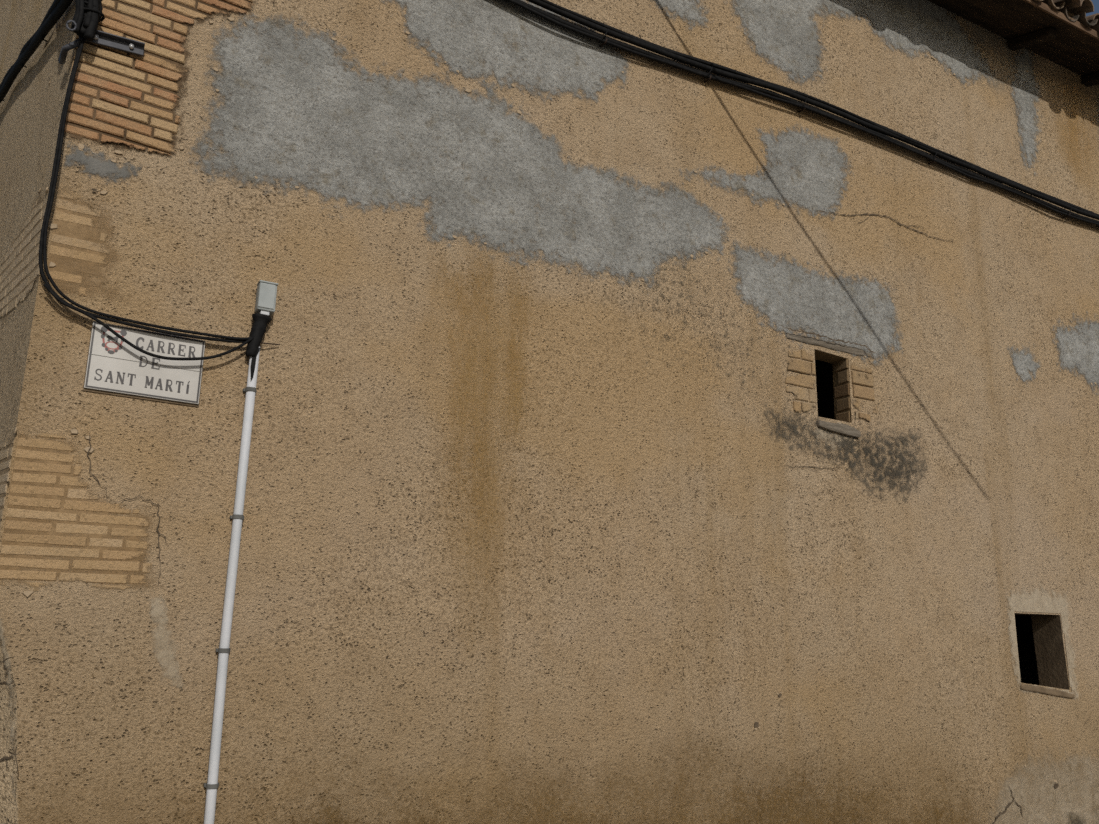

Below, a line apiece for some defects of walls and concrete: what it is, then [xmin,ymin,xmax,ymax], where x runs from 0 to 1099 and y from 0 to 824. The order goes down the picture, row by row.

peeling [732,0,991,84]
peeling [1011,49,1041,174]
peeling [0,0,902,364]
peeling [1054,314,1099,394]
damp [871,441,917,485]
spalling [0,428,152,598]
peeling [151,598,179,683]
peeling [995,756,1099,824]